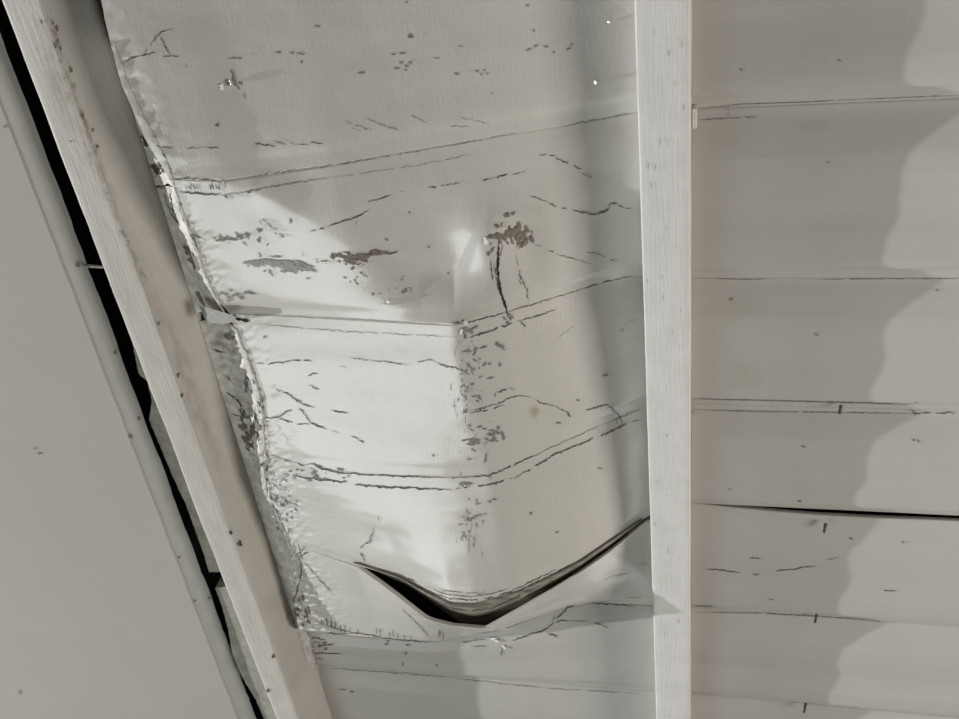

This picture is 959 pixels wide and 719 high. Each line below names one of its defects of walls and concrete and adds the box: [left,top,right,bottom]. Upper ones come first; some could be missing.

peeling [213,219,398,285]
crack [152,115,514,249]
peeling [484,212,534,256]
crack [483,154,591,181]
crack [531,196,632,215]
crack [227,243,676,491]
peeling [238,376,261,448]
peeling [261,462,349,534]
peeling [289,590,311,629]
crack [314,517,614,693]
crack [501,564,645,655]